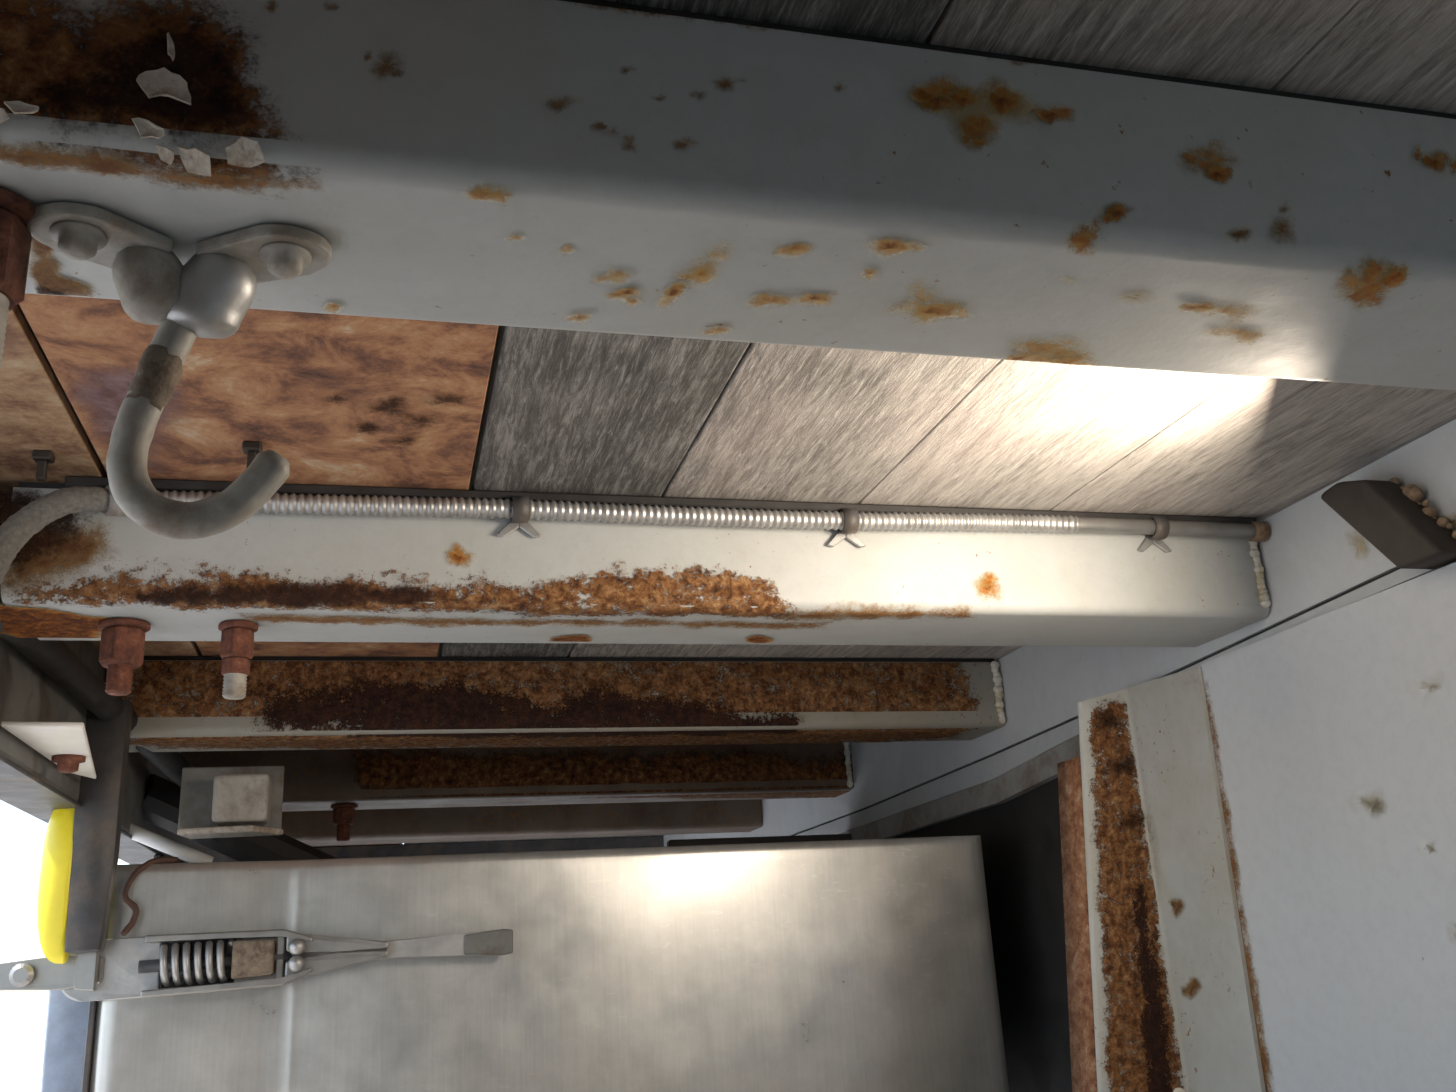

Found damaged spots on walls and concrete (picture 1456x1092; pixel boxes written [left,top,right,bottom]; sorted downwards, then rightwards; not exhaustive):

peeling [0,101,39,124]
corrosion [0,0,318,194]
peeling [136,32,191,105]
peeling [132,117,266,177]
corrosion [911,76,1073,148]
corrosion [1340,260,1408,307]
corrosion [0,489,40,526]
corrosion [0,513,973,643]
corrosion [976,573,1000,597]
corrosion [120,661,982,800]
corrosion [1057,699,1200,1092]
corrosion [1207,696,1272,1092]